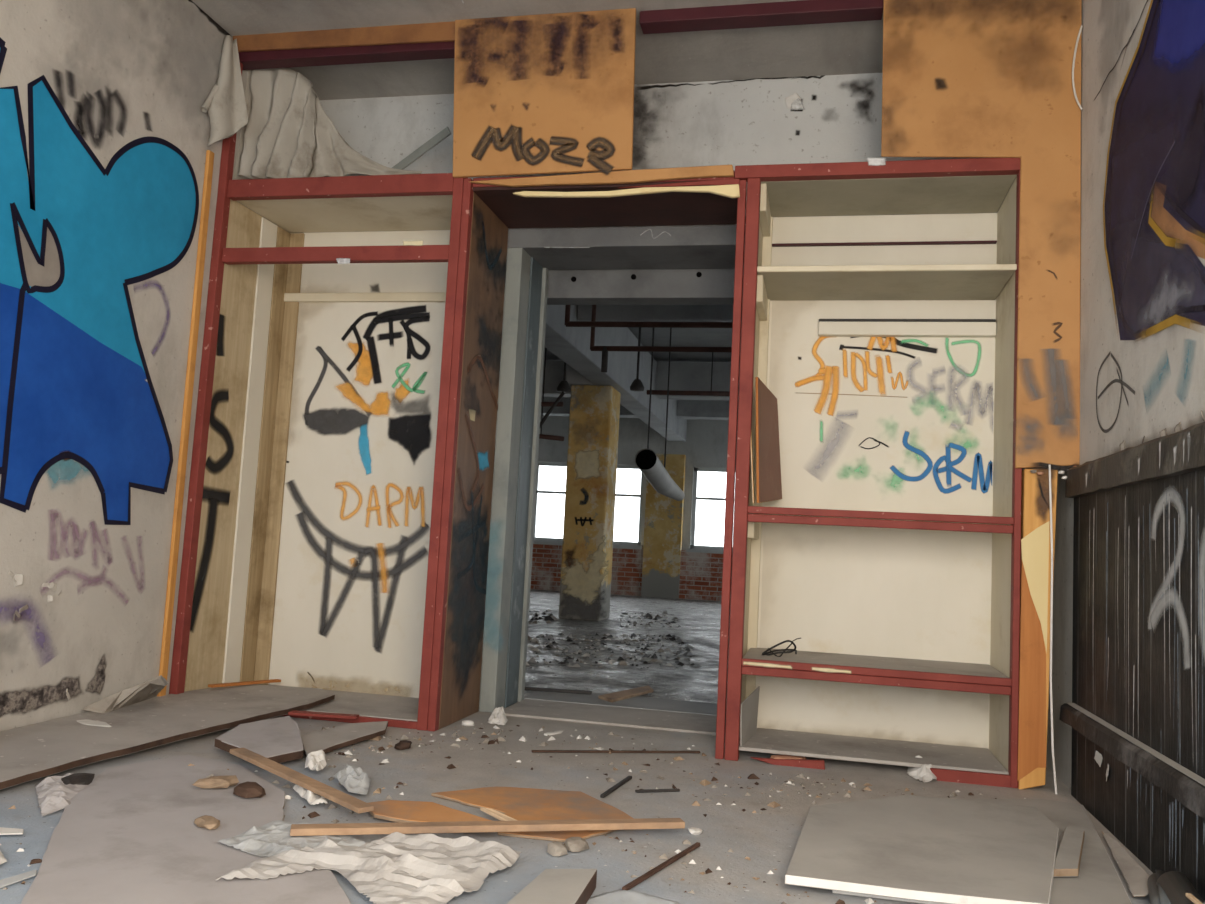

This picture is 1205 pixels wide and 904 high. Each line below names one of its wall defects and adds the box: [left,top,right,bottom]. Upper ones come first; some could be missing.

spalling [0,655,106,717]